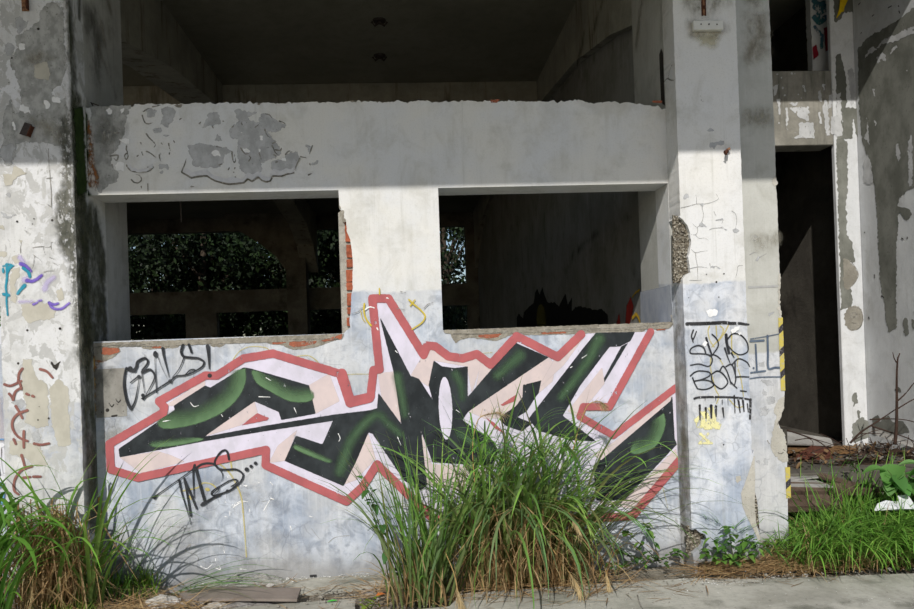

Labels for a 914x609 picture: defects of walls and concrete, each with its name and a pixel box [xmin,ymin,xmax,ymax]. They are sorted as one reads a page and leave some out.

peeling [833,0,861,22]
peeling [0,1,68,197]
damp [90,105,131,193]
peeling [124,104,182,190]
peeling [181,103,318,187]
peeling [773,5,914,336]
damp [44,0,107,531]
spalling [93,205,353,361]
spalling [672,215,689,283]
crack [681,194,765,281]
peeling [9,359,71,467]
spalling [736,380,788,548]